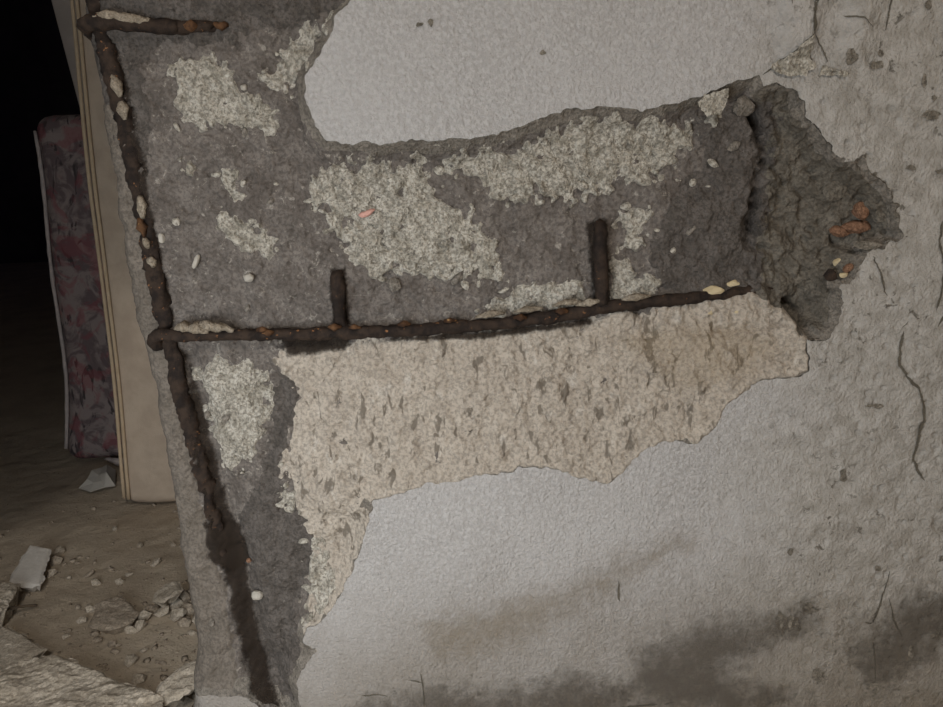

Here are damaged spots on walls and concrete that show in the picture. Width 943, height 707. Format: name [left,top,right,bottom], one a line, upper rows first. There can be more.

crack [763,0,828,75]
peeling [771,35,859,77]
crack [844,0,892,30]
rust [116,51,168,289]
spalling [760,83,904,249]
rust [256,268,362,355]
spalling [91,0,810,707]
rust [390,308,591,341]
spalling [798,241,872,341]
crack [898,322,926,481]
damp [638,609,807,707]
damp [857,598,943,680]